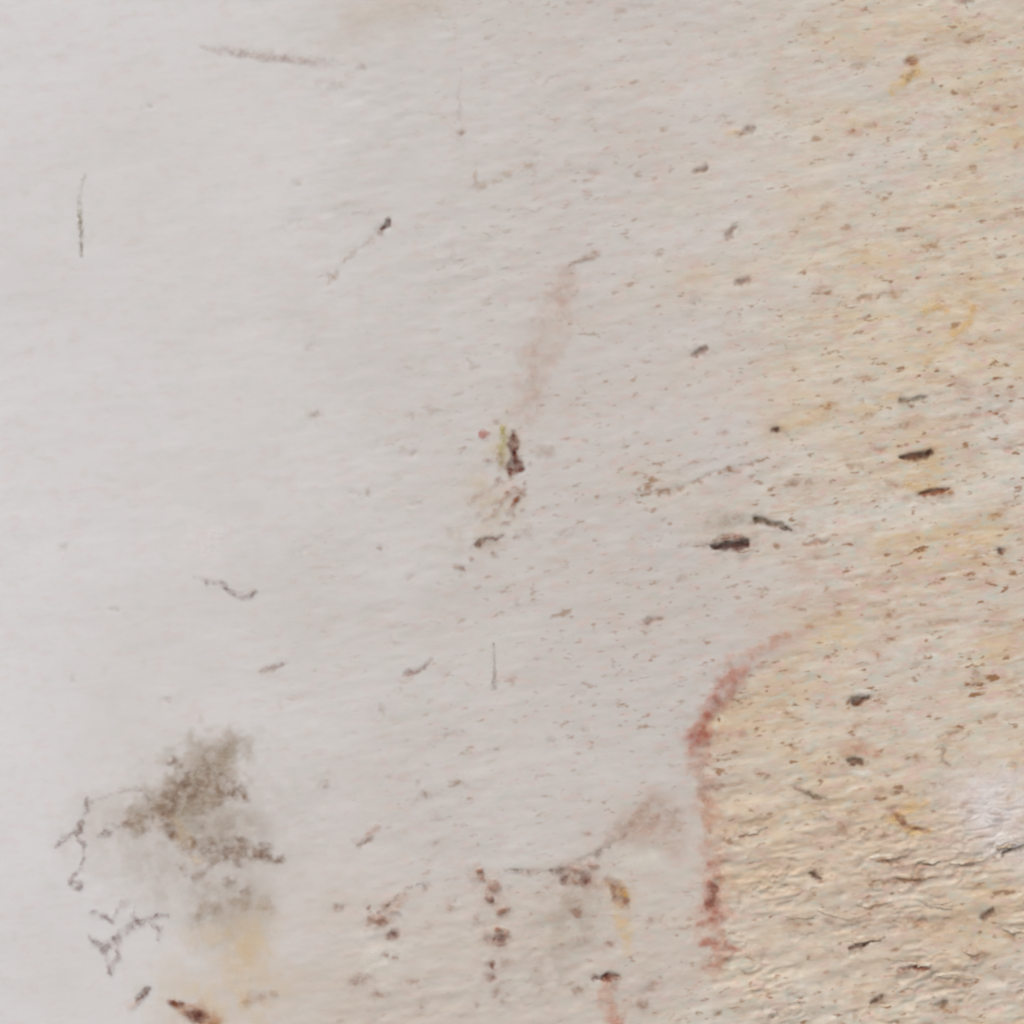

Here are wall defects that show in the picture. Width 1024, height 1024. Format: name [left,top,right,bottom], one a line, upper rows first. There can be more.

leakage [134,743,231,831]